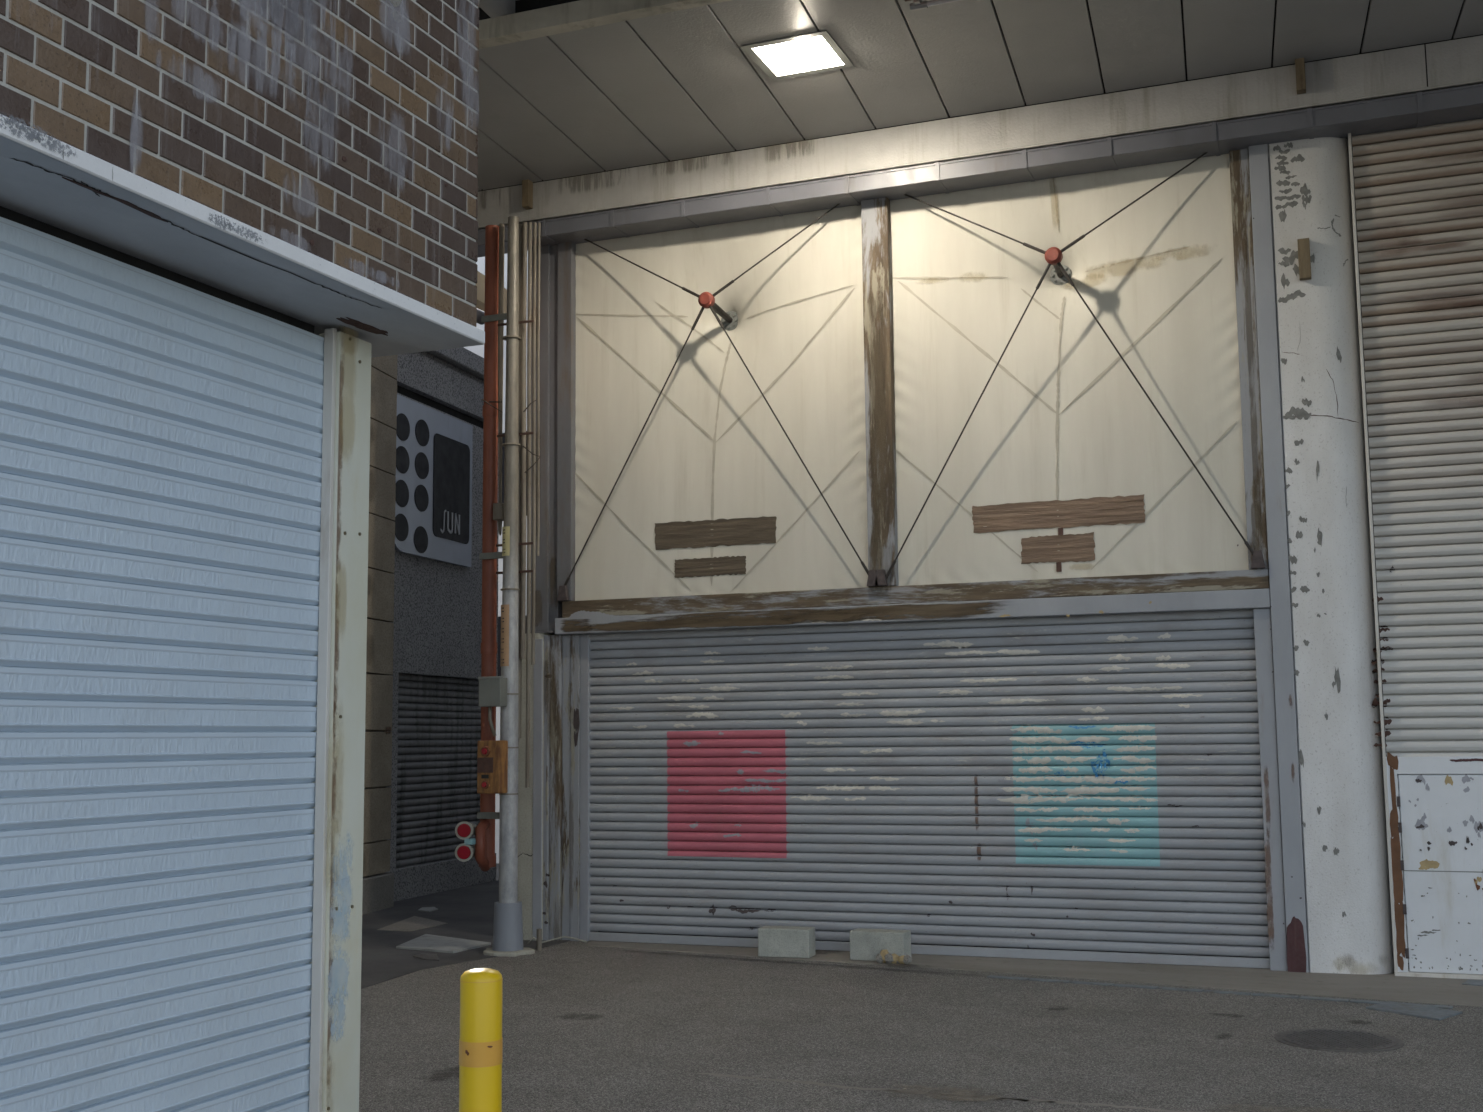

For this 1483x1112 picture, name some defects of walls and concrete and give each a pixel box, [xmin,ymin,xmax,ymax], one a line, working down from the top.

peeling [1273,142,1312,222]
damp [209,214,262,241]
peeling [1278,247,1315,303]
peeling [626,651,739,747]
peeling [808,646,945,726]
peeling [923,640,1040,656]
peeling [938,678,1055,704]
peeling [1077,633,1202,708]
peeling [718,748,900,802]
peeling [990,706,1183,853]
rust [1371,625,1406,971]
peeling [1409,774,1483,870]